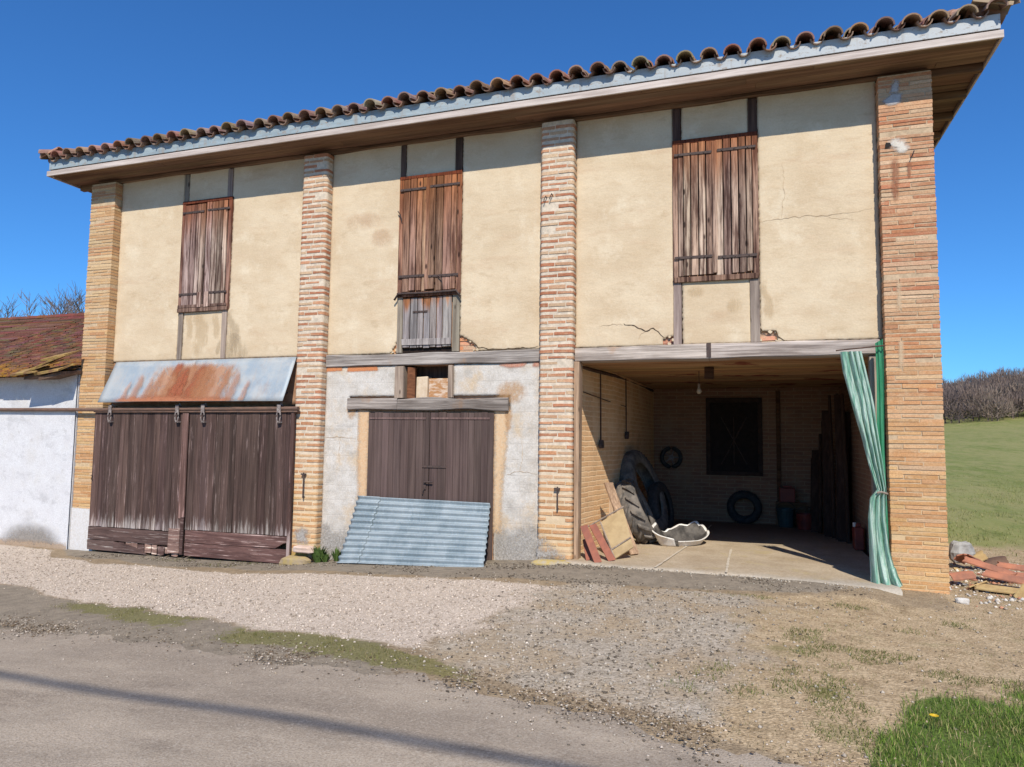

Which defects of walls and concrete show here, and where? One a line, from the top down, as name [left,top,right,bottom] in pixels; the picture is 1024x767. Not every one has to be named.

flaking render [460,336,479,352]
flaking render [760,330,778,342]
rust [117,364,234,401]